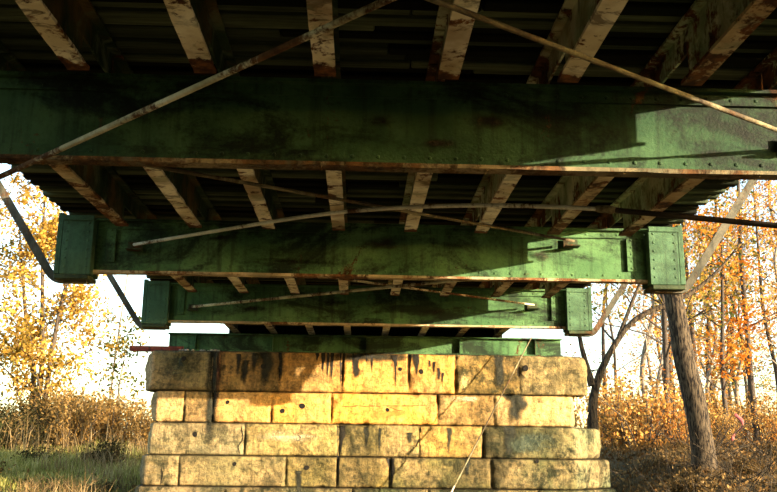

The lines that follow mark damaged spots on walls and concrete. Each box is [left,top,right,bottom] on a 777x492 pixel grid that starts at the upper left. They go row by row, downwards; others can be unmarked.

water stain [206,351,221,435]
water stain [236,352,283,383]
water stain [316,351,444,387]
water stain [494,356,528,455]